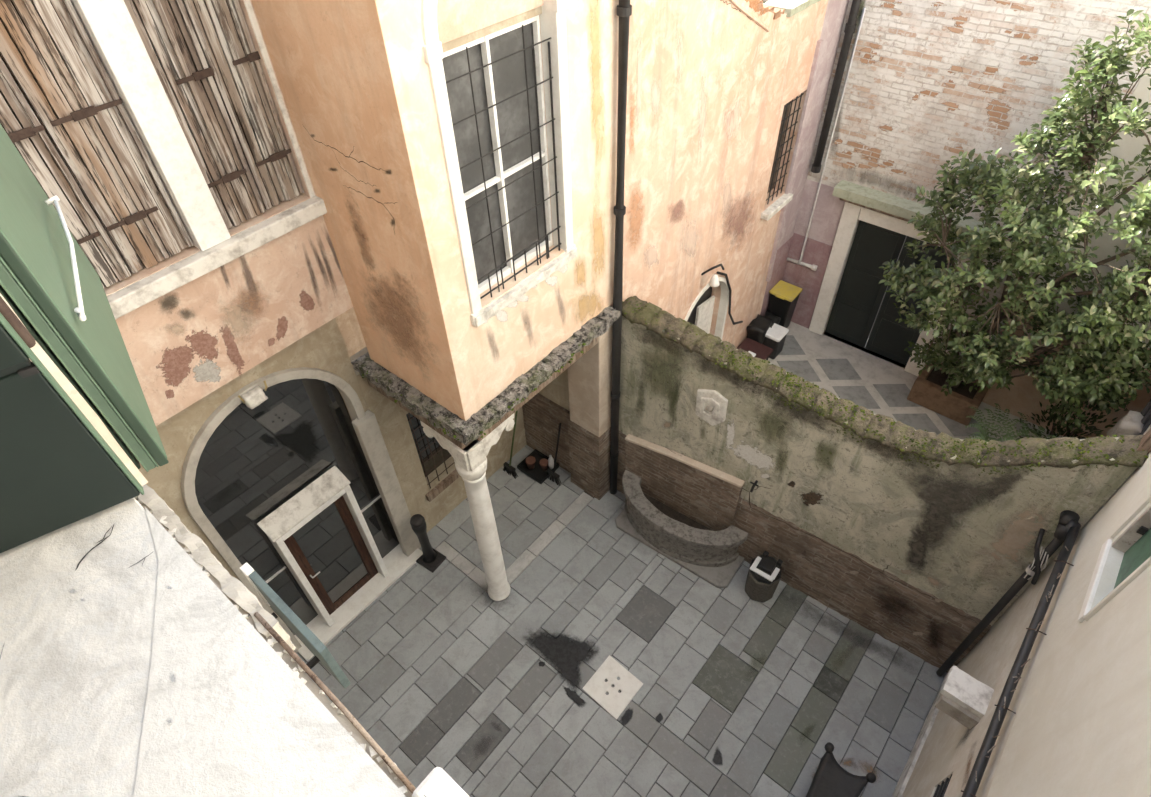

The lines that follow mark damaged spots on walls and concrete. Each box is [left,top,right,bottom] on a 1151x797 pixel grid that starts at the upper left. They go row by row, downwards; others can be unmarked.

crack [304,127,397,232]
leakage [240,257,259,314]
flaking render [268,316,288,346]
flaking render [299,291,315,311]
leakage [306,234,342,293]
leakage [374,284,418,354]
flaking render [156,324,245,399]
leakage [699,360,753,386]
leakage [664,388,678,427]
leakage [760,395,836,468]
leakage [777,452,786,473]
leakage [860,438,1022,585]